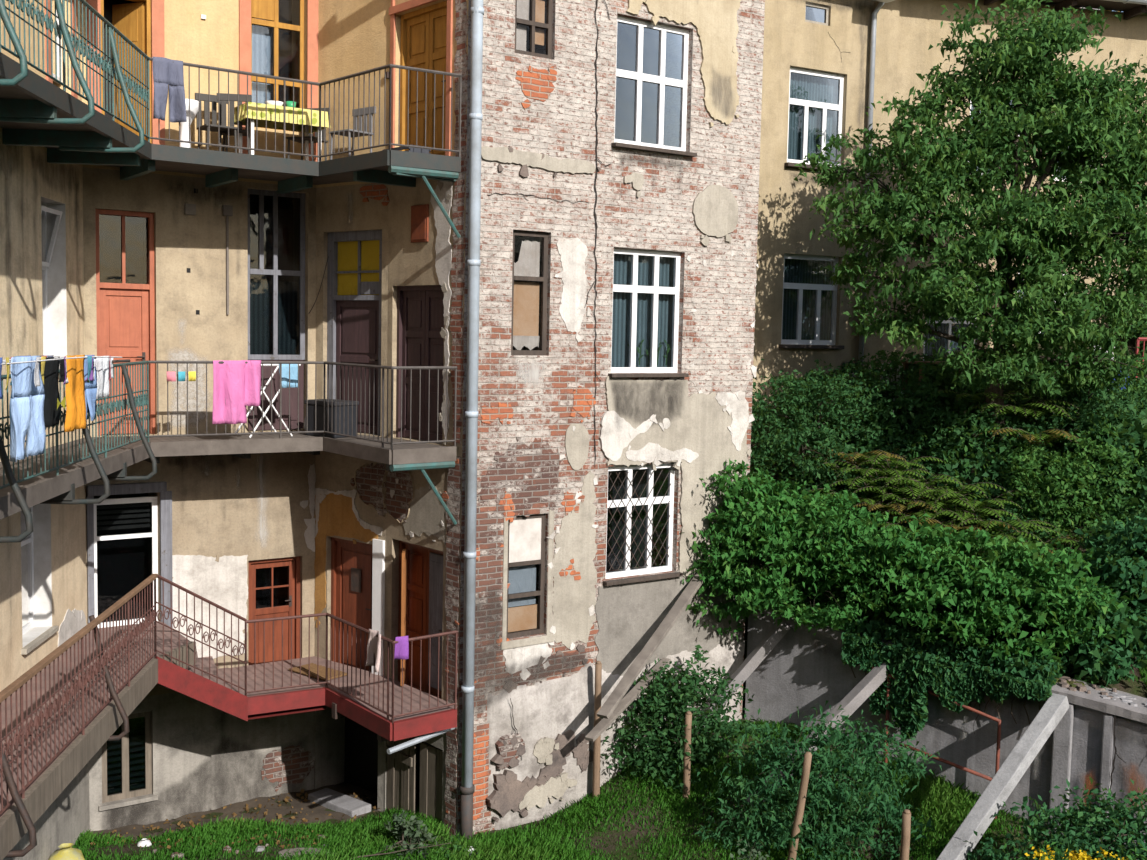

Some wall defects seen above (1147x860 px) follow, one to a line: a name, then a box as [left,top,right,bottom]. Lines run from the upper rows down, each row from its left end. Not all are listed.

spalling [515,65,557,110]
spalling [481,146,601,178]
crack [487,0,610,461]
flaking render [300,0,469,704]
peeling [569,386,699,471]
water stain [613,382,677,420]
peeling [698,390,755,456]
spalling [261,745,315,792]
spalling [473,729,593,823]
crack [1108,715,1126,805]